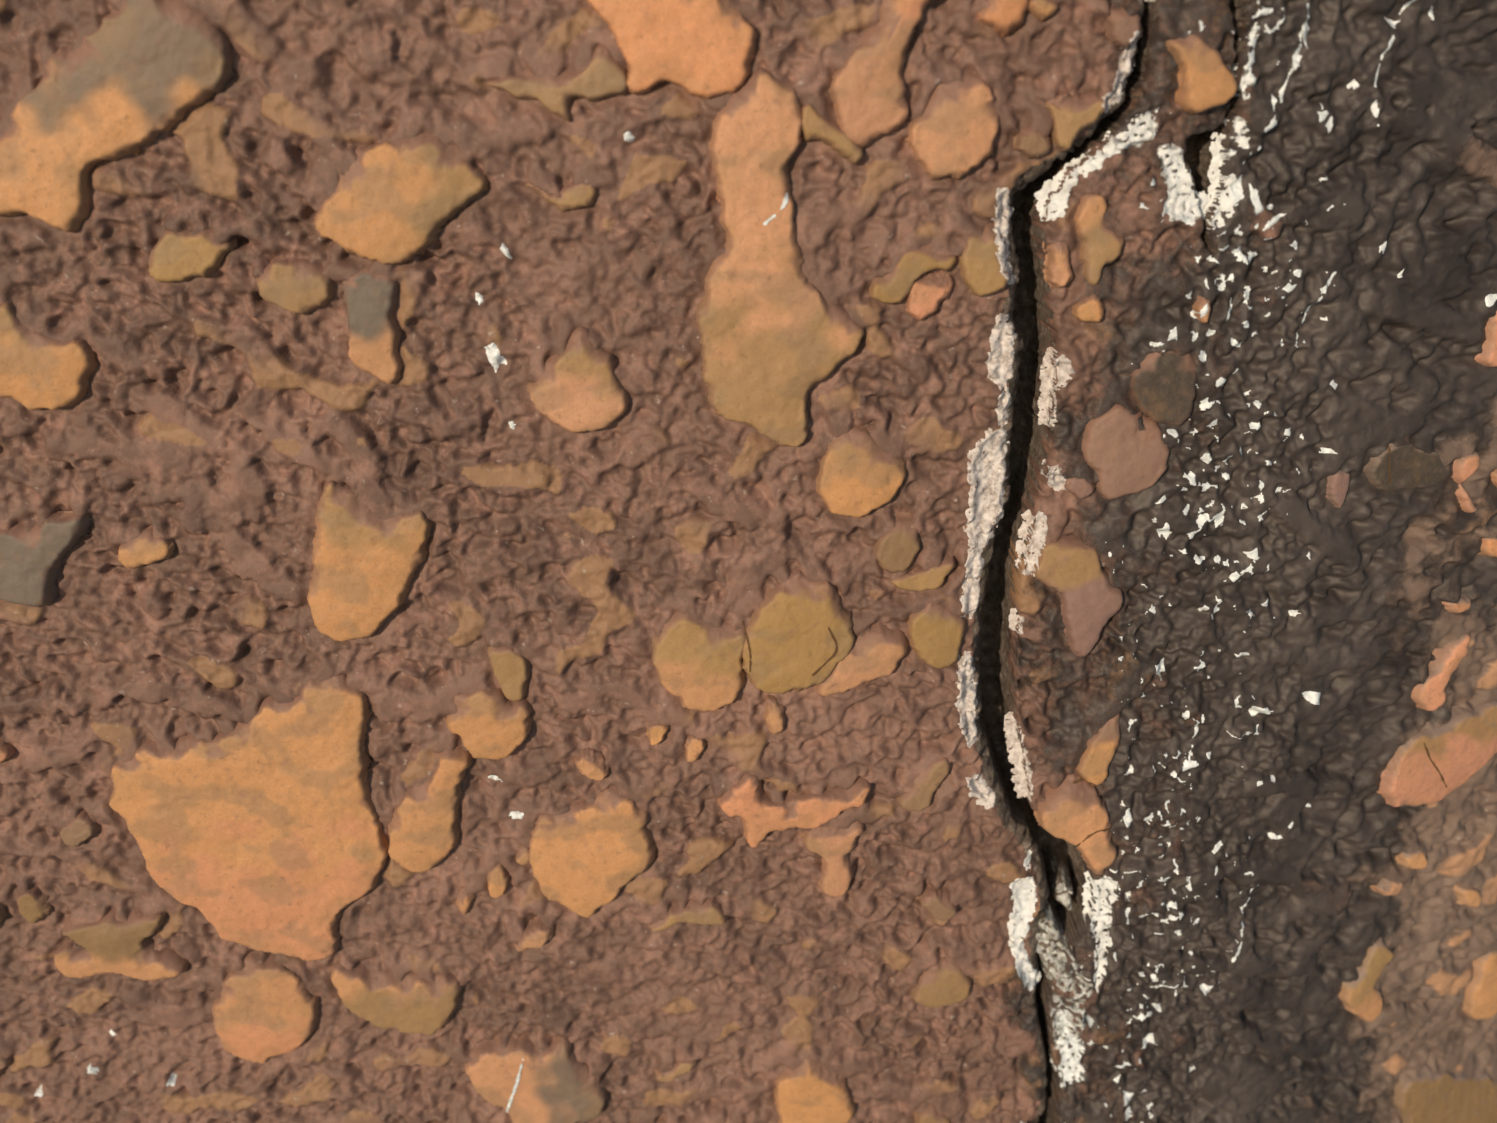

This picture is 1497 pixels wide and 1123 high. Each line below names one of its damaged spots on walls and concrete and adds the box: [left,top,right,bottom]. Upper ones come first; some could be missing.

crack [955,0,1159,1123]
crack [1184,0,1260,252]
damp [1005,0,1497,1123]